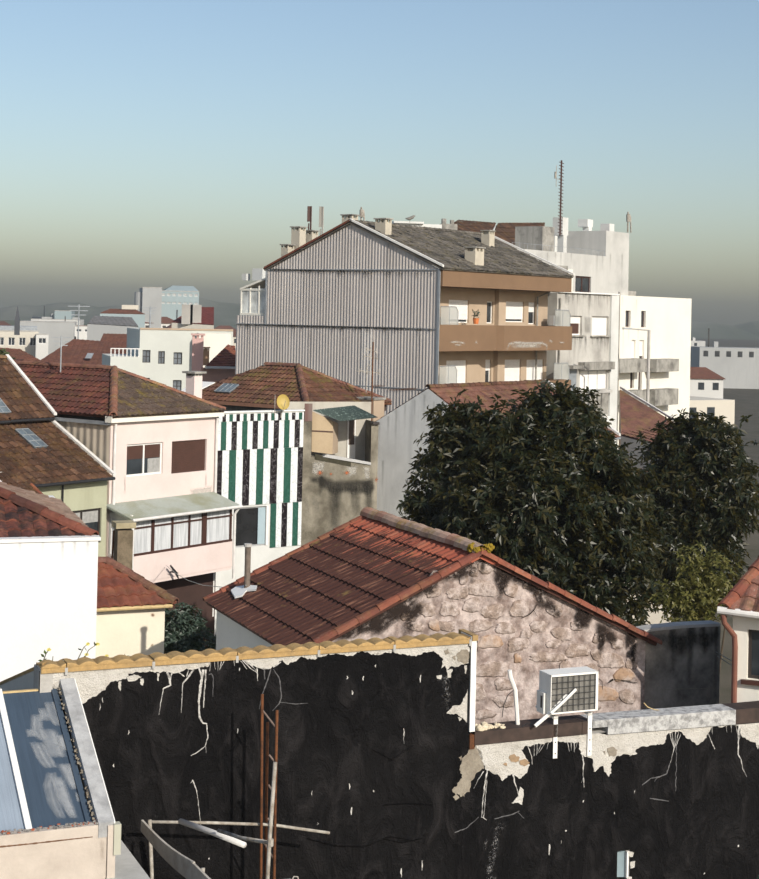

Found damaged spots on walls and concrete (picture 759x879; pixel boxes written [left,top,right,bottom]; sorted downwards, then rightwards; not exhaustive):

peeling [239,644,470,679]
damp [576,608,637,660]
damp [659,627,718,655]
peeling [53,662,210,708]
peeling [447,689,468,722]
peeling [452,723,759,805]
crack [642,745,677,801]